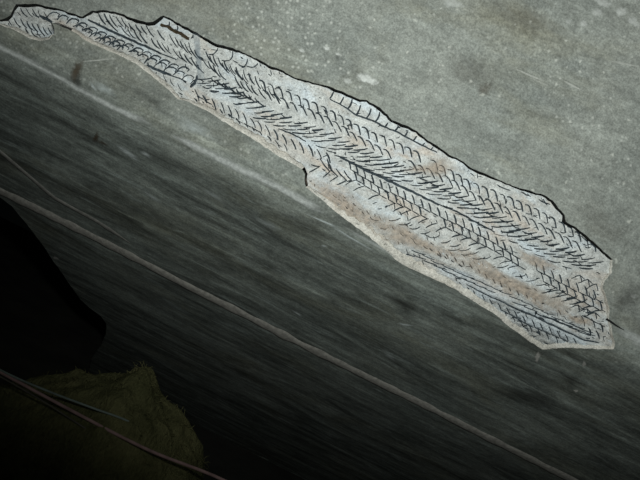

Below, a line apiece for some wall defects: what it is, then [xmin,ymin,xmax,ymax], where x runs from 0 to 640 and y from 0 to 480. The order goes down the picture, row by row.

spalling [0,4,615,349]